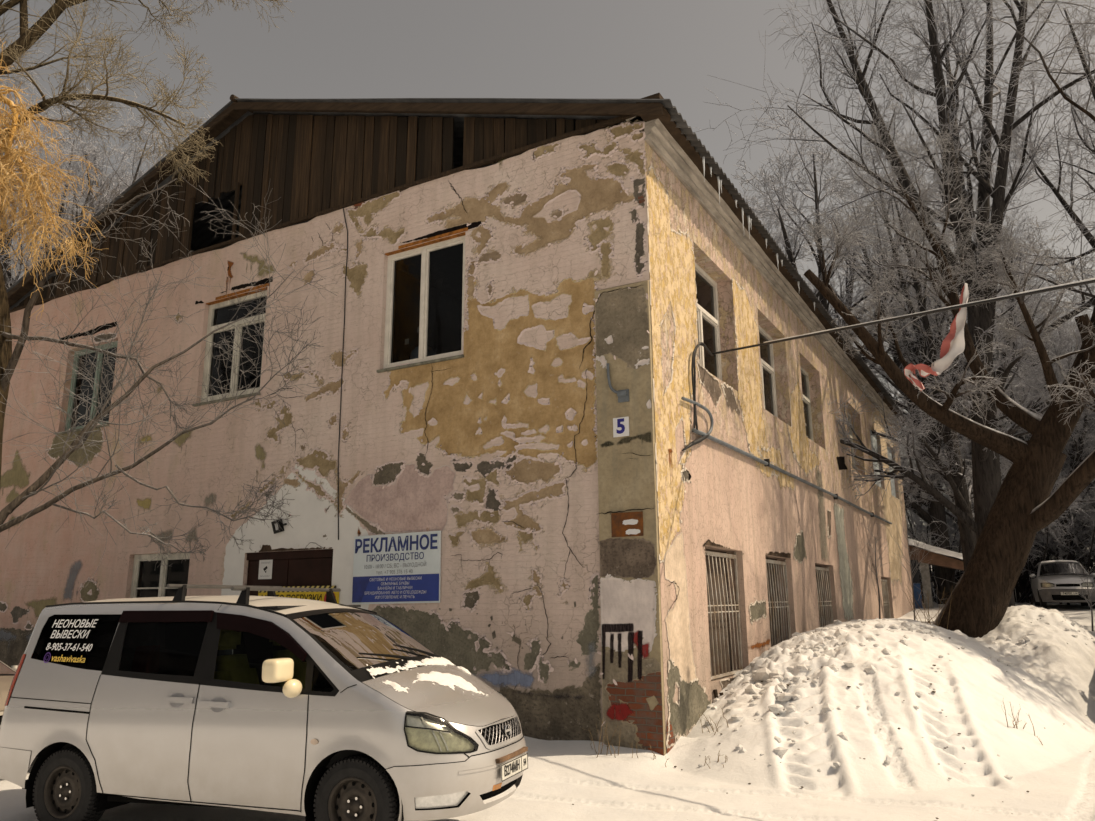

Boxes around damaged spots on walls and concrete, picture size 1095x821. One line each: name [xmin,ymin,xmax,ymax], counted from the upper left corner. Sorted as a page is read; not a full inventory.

flaking render [221,266,273,293]
peeling [229,121,820,564]
crack [562,285,641,574]
flaking render [836,456,848,470]
peeling [79,577,99,602]
flaking render [372,562,554,684]
crack [510,581,568,692]
flaking render [518,569,712,755]